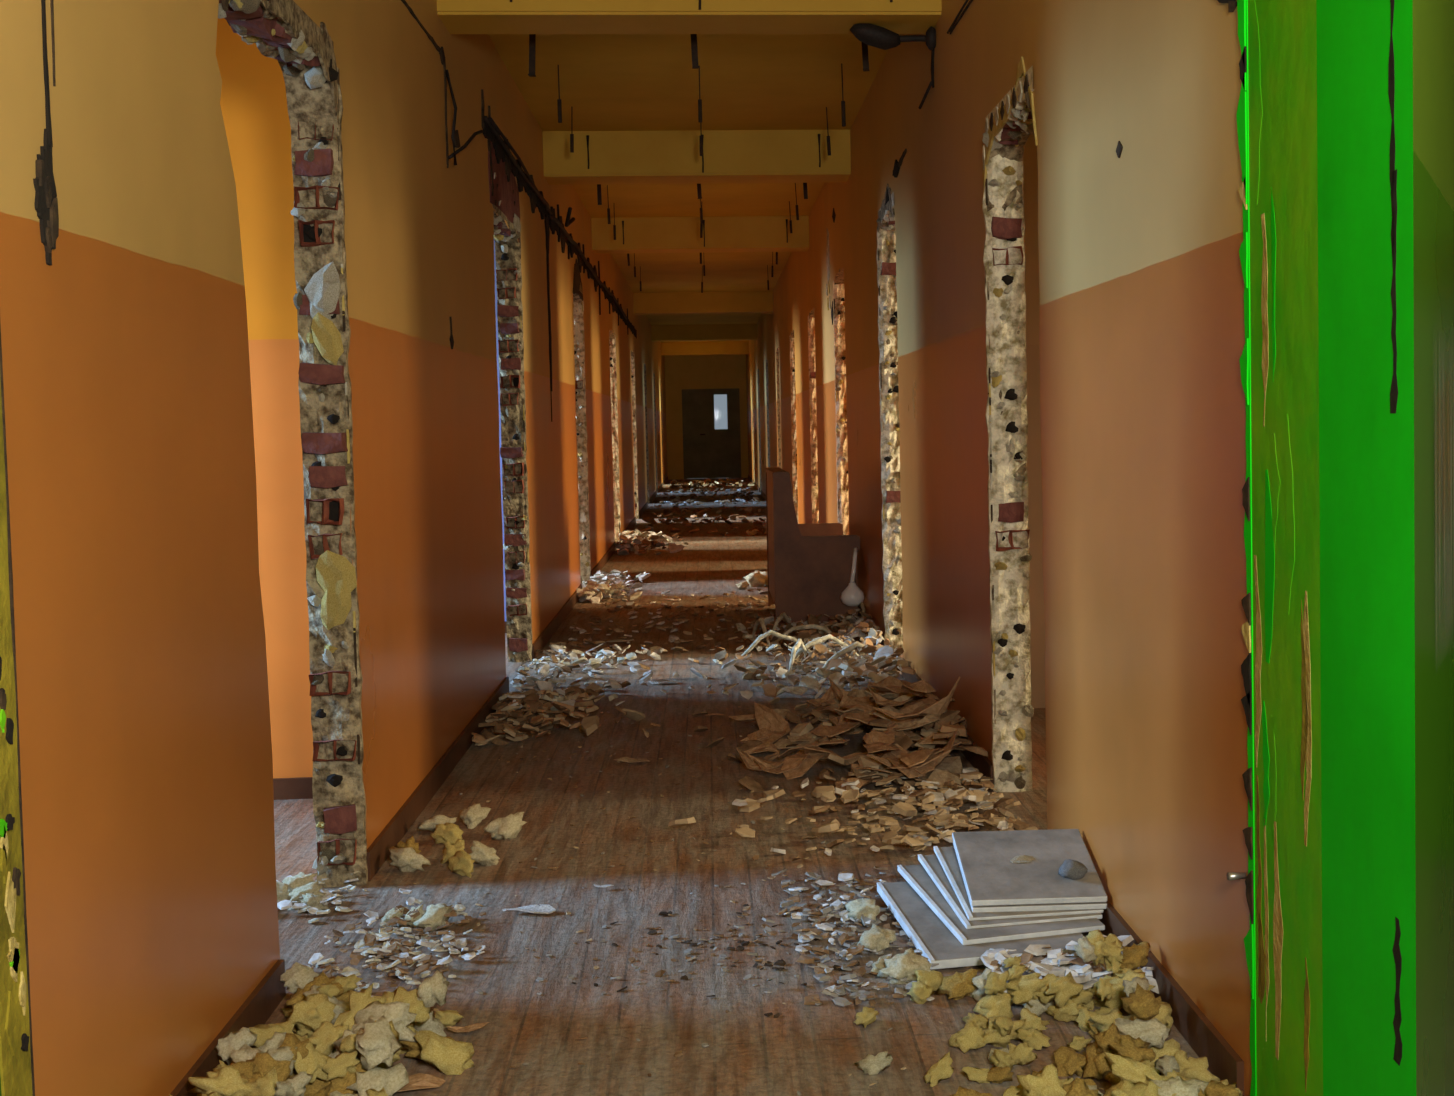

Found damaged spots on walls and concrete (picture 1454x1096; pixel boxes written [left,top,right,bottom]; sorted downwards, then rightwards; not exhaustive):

spalling [218,0,368,888]
spalling [488,142,533,662]
spalling [982,57,1038,792]